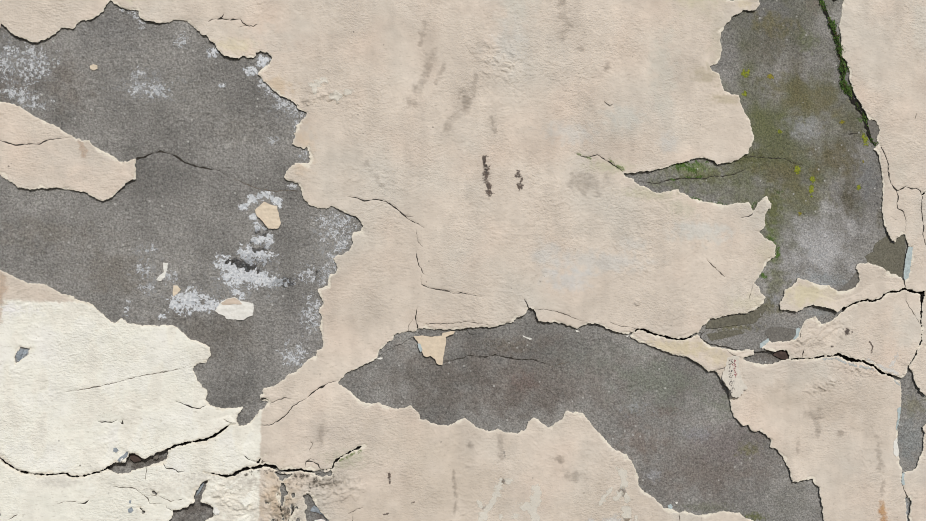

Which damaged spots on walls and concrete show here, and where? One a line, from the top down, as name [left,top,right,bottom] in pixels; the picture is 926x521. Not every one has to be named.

damp [243,54,307,138]
crack [819,0,926,244]
peeling [0,1,363,426]
damp [136,243,222,320]
damp [213,191,357,367]
peeling [338,0,913,521]
crack [842,279,924,363]
crack [0,419,232,510]
peeling [101,445,174,474]
peeling [169,480,220,521]
crack [212,442,361,478]
peeling [892,364,926,485]